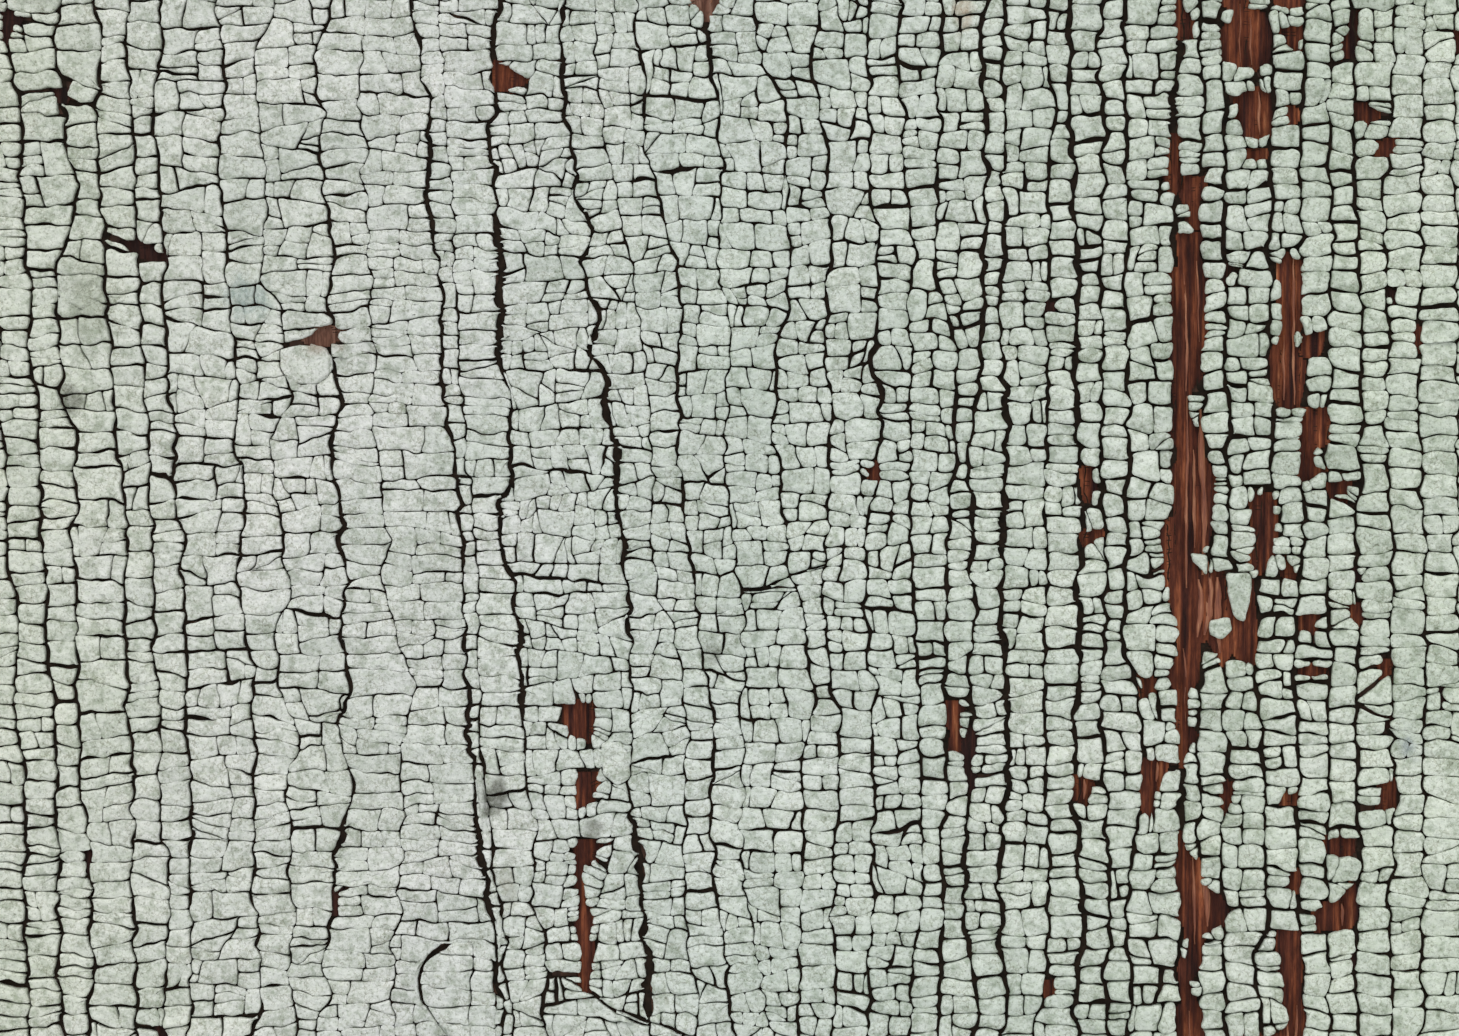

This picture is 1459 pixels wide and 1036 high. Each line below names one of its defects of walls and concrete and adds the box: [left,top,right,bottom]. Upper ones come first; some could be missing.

crack [1435,0,1459,32]
peeling [482,44,536,95]
peeling [105,220,204,282]
peeling [280,307,376,384]
crack [1435,338,1459,385]
peeling [1045,0,1459,1036]
crack [1443,582,1459,619]
peeling [918,699,1007,802]
crack [107,783,268,1036]
crack [258,910,378,1036]
peeling [545,838,634,1023]
crack [1194,927,1232,1036]